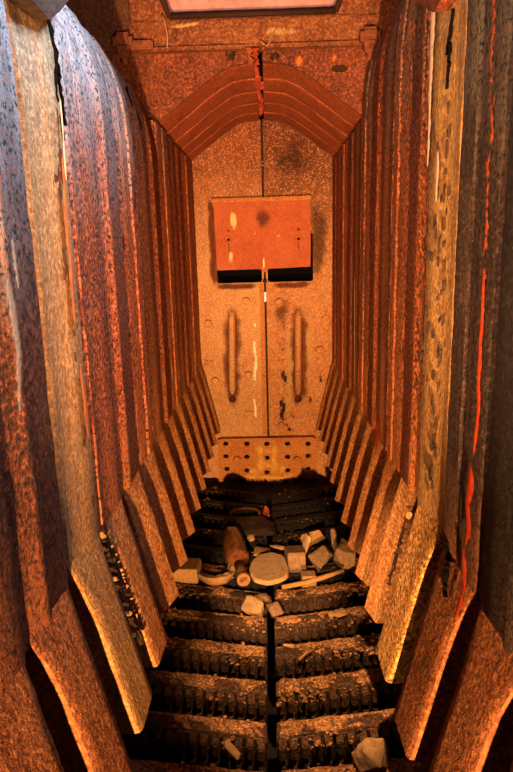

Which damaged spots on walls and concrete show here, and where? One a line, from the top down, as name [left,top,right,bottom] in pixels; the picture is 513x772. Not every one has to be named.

crack [47,19,67,141]
crack [250,52,264,117]
crack [445,8,455,89]